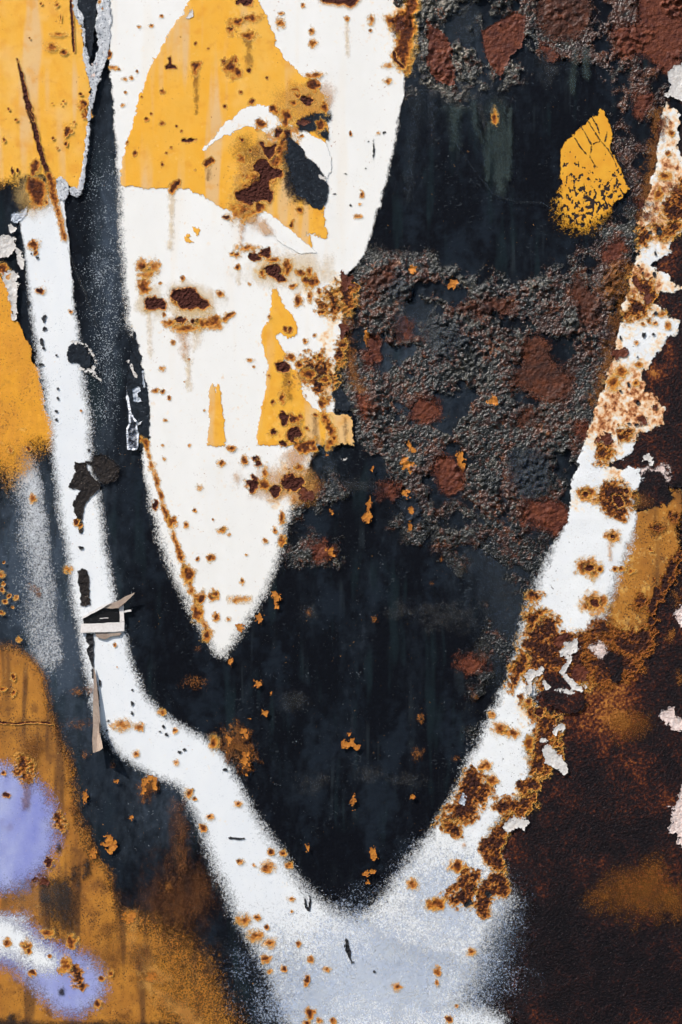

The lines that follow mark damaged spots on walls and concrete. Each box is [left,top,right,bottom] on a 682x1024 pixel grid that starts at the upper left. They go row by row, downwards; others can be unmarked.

rust [226,0,262,40]
rust [221,55,255,105]
rust [664,63,682,106]
peeling [120,0,332,254]
rust [222,72,329,225]
crack [574,117,617,167]
rust [656,116,682,157]
rust [11,159,48,208]
rust [136,257,236,345]
peeling [68,449,120,533]
rust [426,171,682,1024]
rust [208,719,259,776]